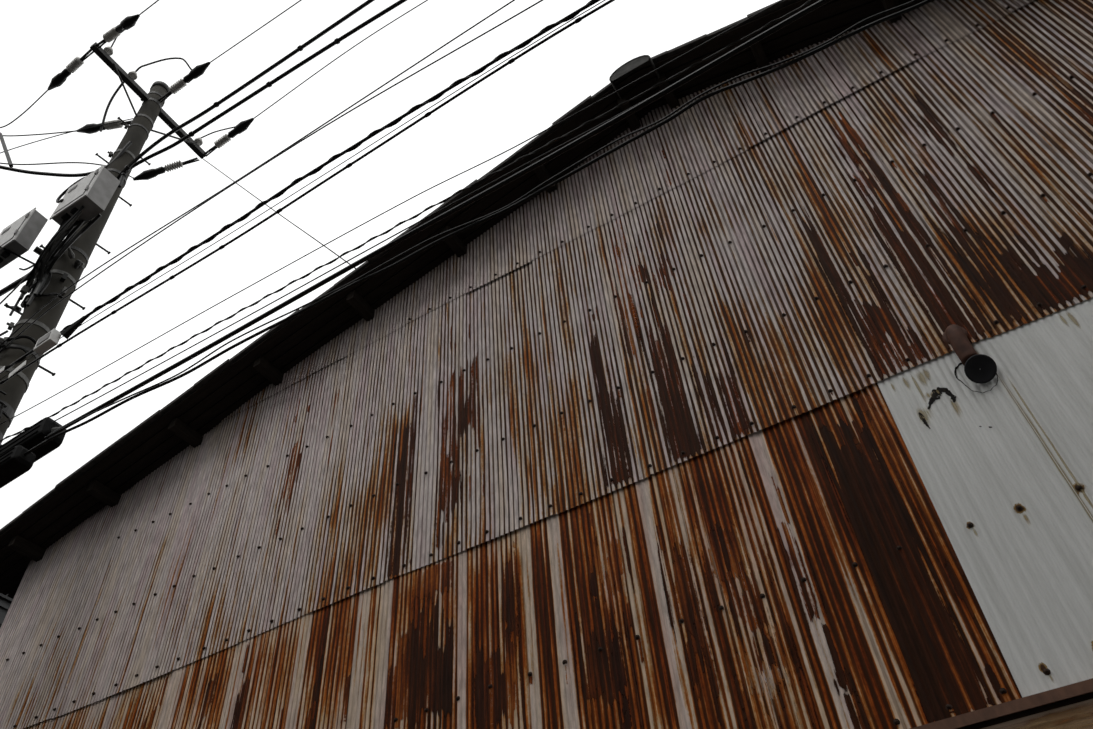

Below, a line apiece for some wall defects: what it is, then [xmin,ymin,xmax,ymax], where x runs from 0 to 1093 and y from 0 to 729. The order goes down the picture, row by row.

rust [1041,70,1093,131]
rust [793,93,1093,380]
rust [137,677,168,729]
rust [230,642,253,729]
rust [301,655,323,729]
rust [341,667,352,729]
rust [384,326,485,729]
rust [472,533,533,729]
rust [565,502,644,729]
rust [586,219,872,729]
rust [812,389,1008,723]